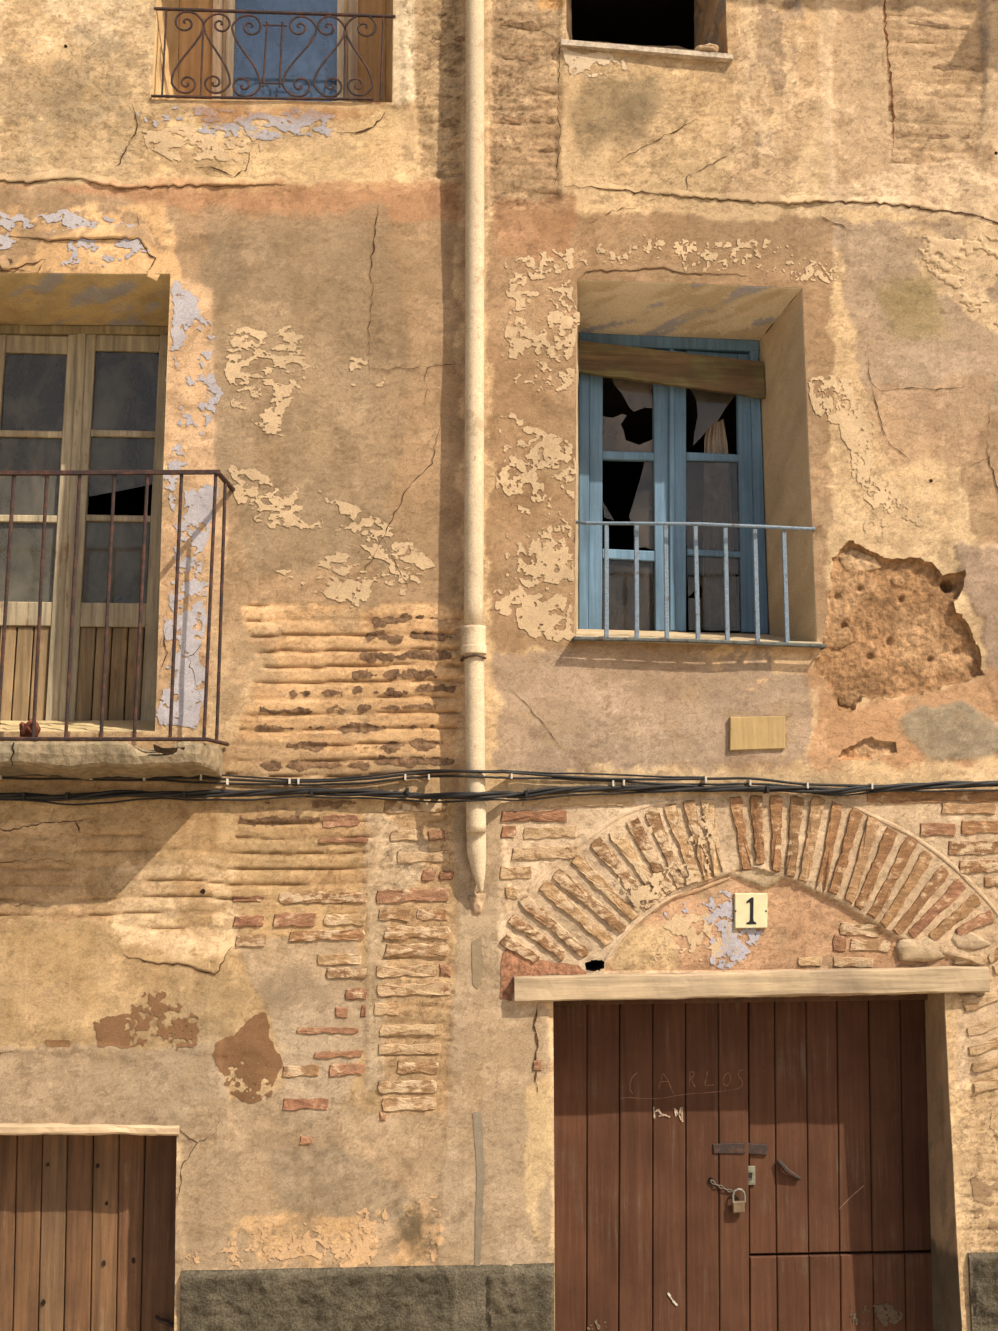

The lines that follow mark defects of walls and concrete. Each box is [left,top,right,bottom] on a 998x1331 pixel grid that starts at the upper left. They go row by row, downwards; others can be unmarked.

crack [0,104,287,281]
crack [343,111,386,133]
crack [542,29,998,231]
crack [884,0,895,153]
peeling [501,234,848,392]
crack [866,346,998,489]
peeling [156,280,435,729]
peeling [493,413,577,644]
spalling [255,613,457,772]
flaking render [813,540,985,712]
crack [125,943,233,975]
flaking render [213,829,454,1121]